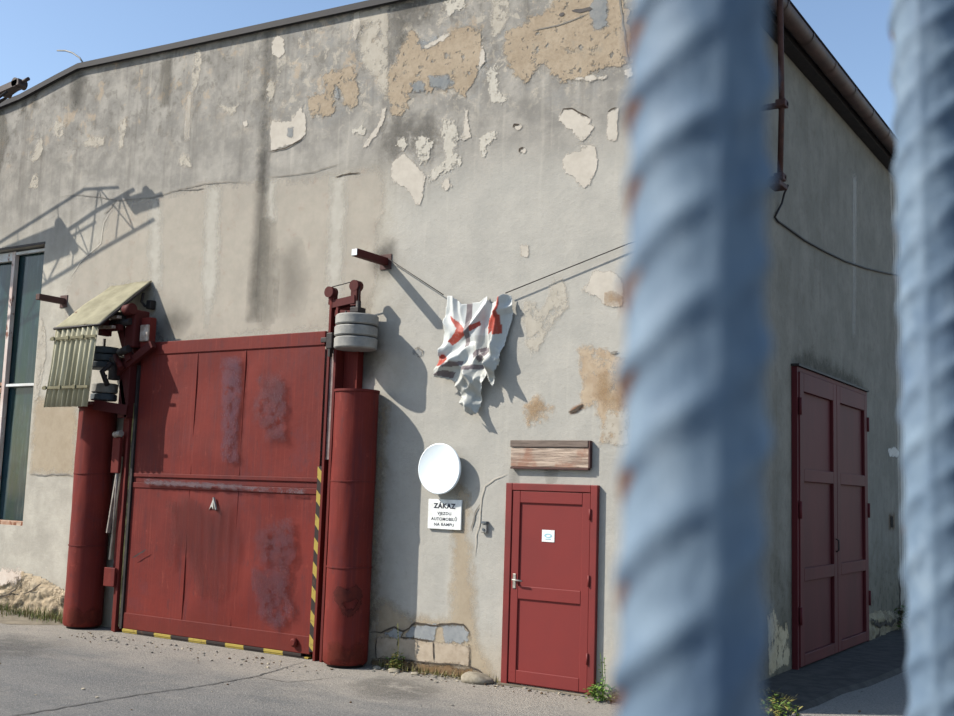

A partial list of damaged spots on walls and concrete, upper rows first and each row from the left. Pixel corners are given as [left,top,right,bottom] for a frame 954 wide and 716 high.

flaking render [270,0,631,205]
crack [62,182,244,214]
flaking render [583,269,622,307]
flaking render [569,346,625,445]
flaking render [0,568,65,617]
flaking render [374,487,489,674]
flaking render [768,609,790,675]